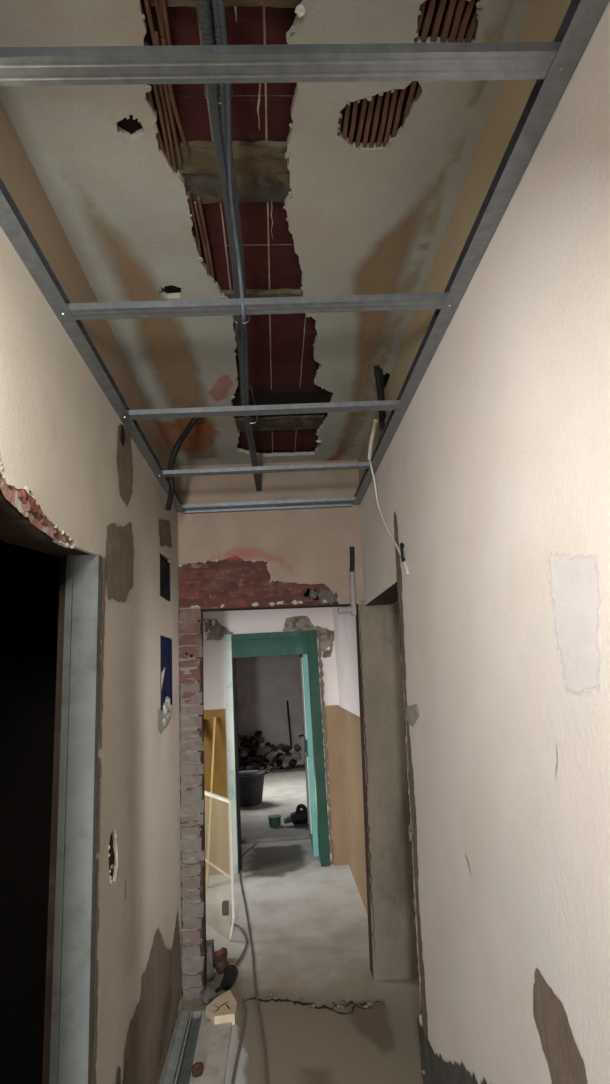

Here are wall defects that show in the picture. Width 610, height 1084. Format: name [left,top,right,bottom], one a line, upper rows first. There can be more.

spalling [414,0,483,43]
spalling [117,115,158,138]
spalling [337,81,422,152]
spalling [160,285,181,299]
spalling [0,453,75,548]
flaking render [178,555,339,1000]
crack [359,601,376,955]
crack [394,512,428,1084]
spalling [108,832,117,885]
crack [244,993,385,1014]